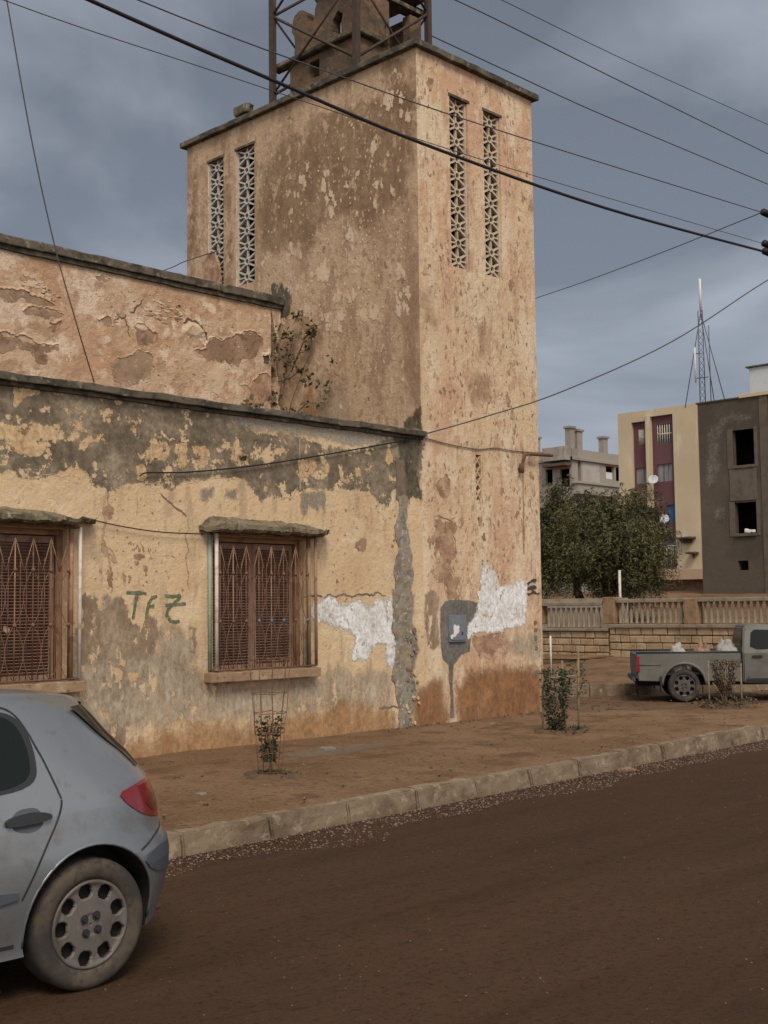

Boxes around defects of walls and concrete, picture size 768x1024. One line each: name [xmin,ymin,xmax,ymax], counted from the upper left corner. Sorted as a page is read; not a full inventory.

flaking render [0,274,64,365]
flaking render [97,289,272,408]
damp [0,373,424,515]
flaking render [423,225,538,600]